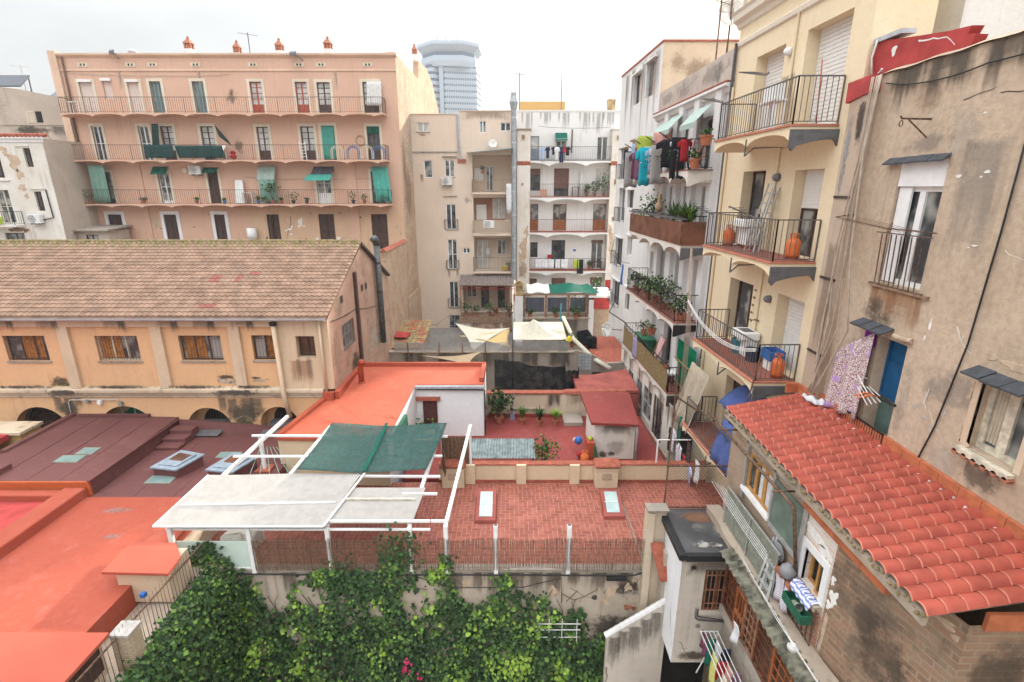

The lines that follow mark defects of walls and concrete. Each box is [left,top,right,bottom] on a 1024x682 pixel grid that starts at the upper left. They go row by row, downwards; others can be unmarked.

water stain [855,103,865,139]
spalling [0,146,29,199]
water stain [0,378,80,415]
water stain [172,385,271,424]